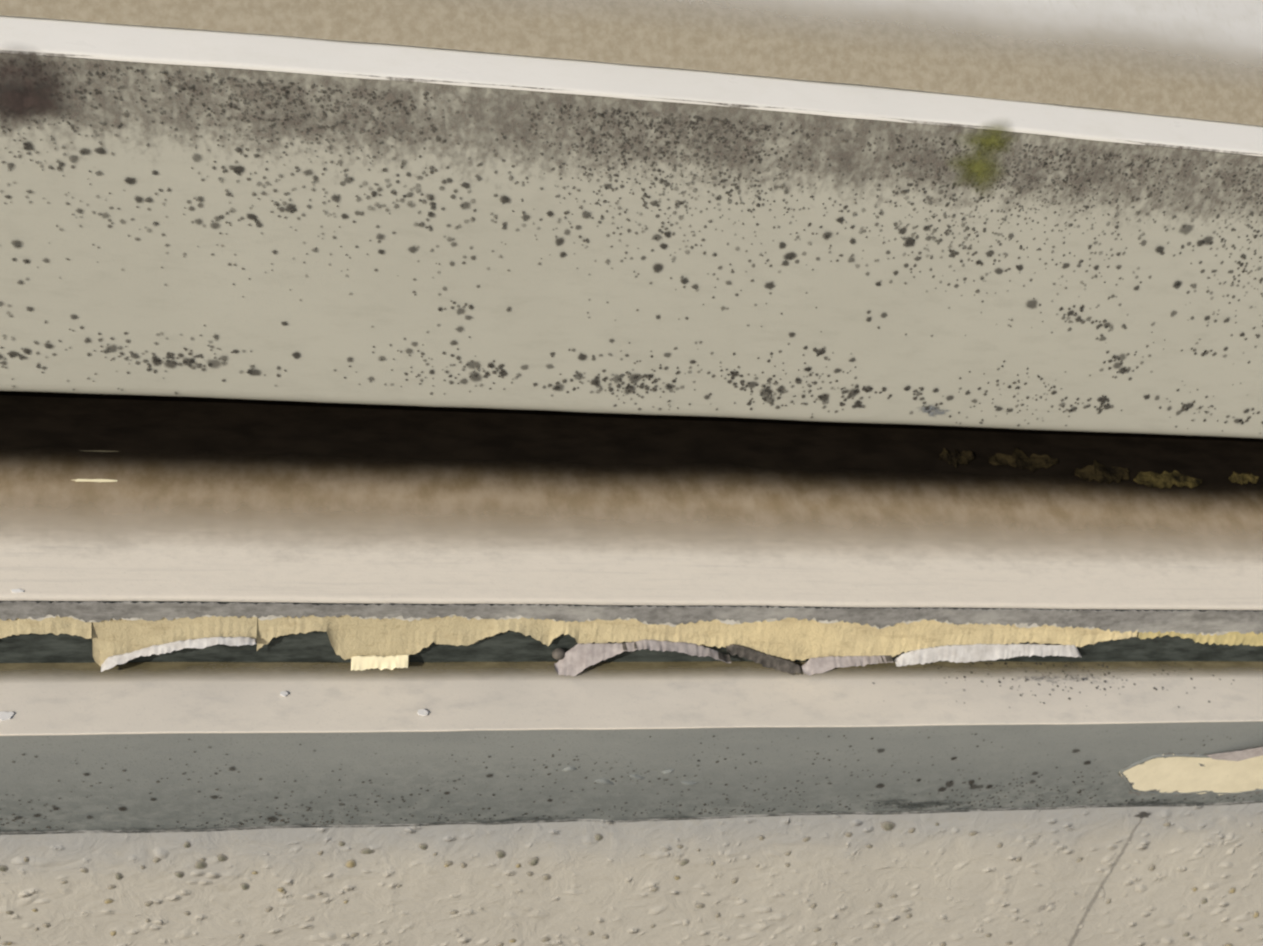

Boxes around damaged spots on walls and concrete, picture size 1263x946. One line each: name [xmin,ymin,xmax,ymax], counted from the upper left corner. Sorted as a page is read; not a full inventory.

damp [0,52,1263,380]
damp [390,288,1122,426]
damp [1144,389,1263,434]
peeling [0,589,1263,676]
crack [1136,811,1150,819]
peeling [1118,747,1263,797]